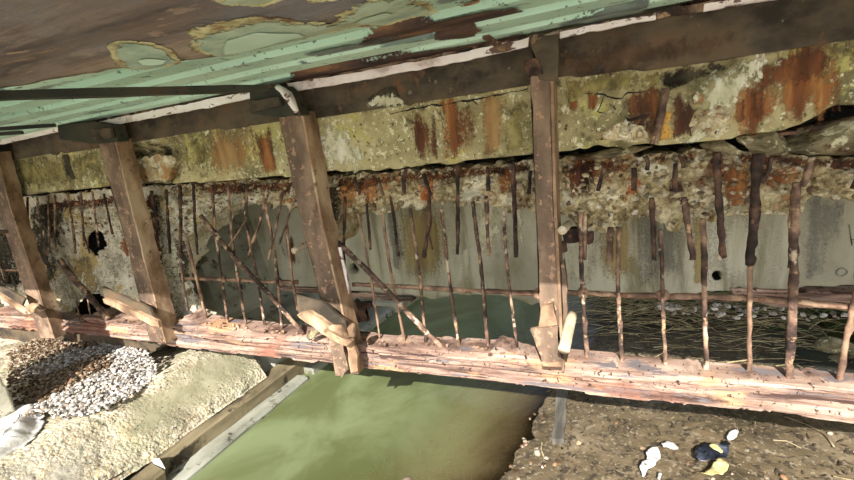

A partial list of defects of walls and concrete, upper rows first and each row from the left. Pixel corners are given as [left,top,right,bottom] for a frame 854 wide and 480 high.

peeling [561,0,649,25]
corrosion [0,0,526,88]
peeling [306,36,397,57]
crack [568,91,650,129]
corrosion [625,86,704,139]
corrosion [733,45,841,135]
water stain [135,142,178,158]
corrosion [336,94,530,205]
spalling [137,153,297,234]
flaking render [329,168,535,215]
corrosion [563,158,643,198]
flaking render [566,154,744,218]